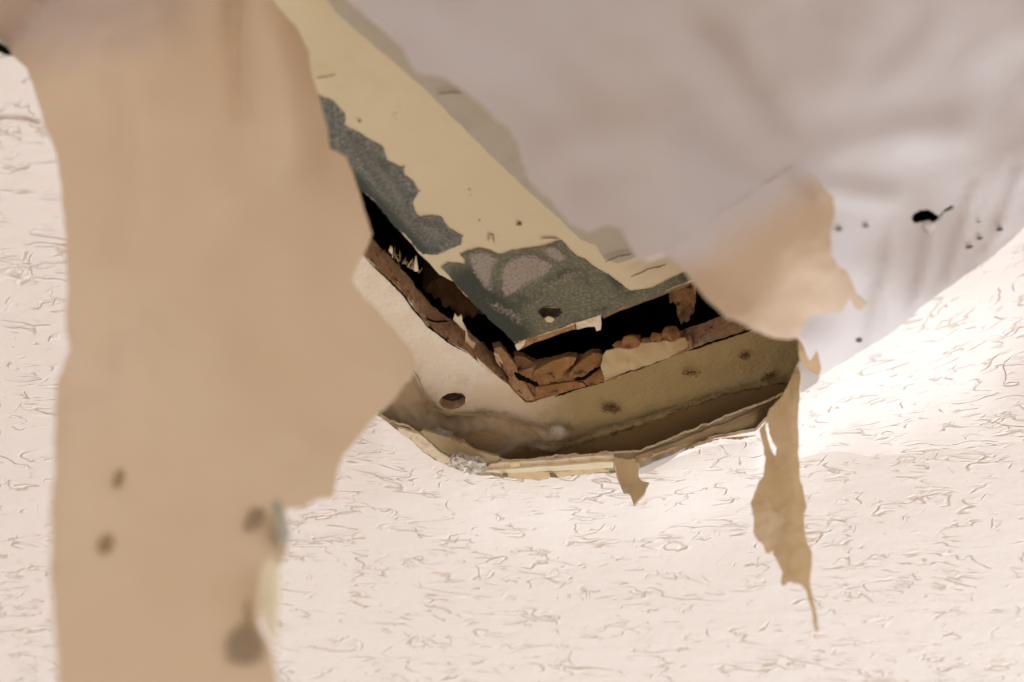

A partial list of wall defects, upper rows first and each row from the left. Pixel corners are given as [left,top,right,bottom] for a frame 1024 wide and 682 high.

peeling [318,0,1024,402]
peeling [502,365,819,631]